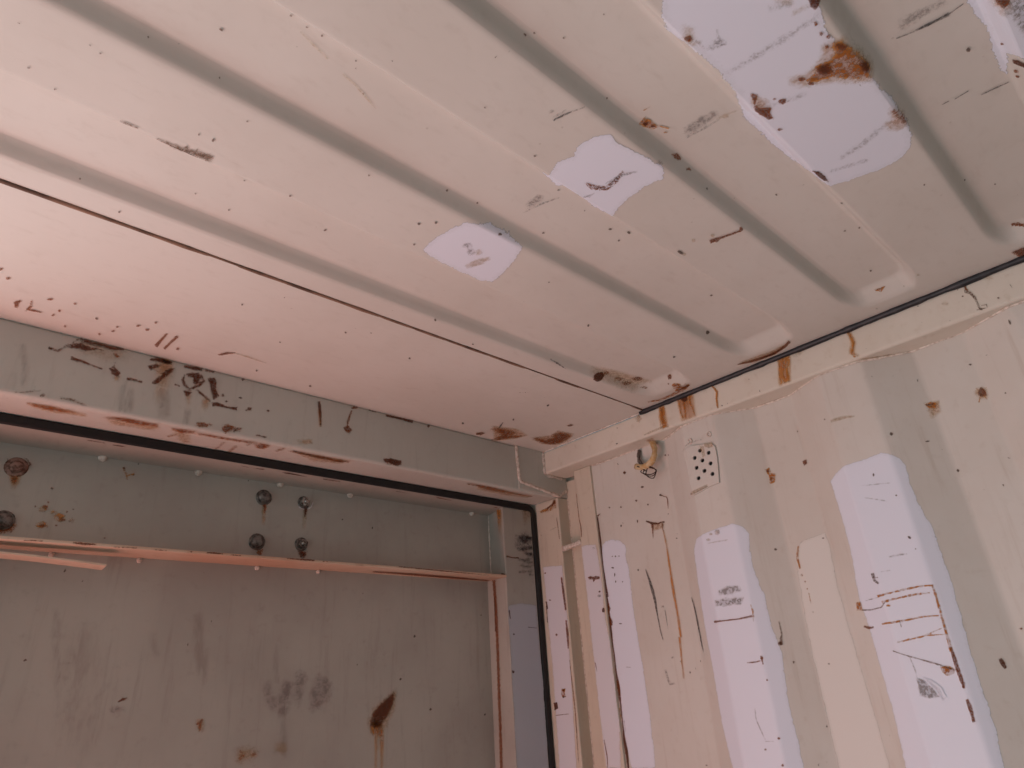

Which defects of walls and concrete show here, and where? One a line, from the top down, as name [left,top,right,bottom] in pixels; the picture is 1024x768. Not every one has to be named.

corrosion [798,22,870,85]
corrosion [48,326,251,411]
corrosion [476,419,520,441]
corrosion [535,425,572,445]
corrosion [593,372,647,389]
corrosion [652,374,694,428]
corrosion [637,520,701,673]
corrosion [370,566,505,768]
peeling [796,533,889,768]
peeling [917,677,947,700]